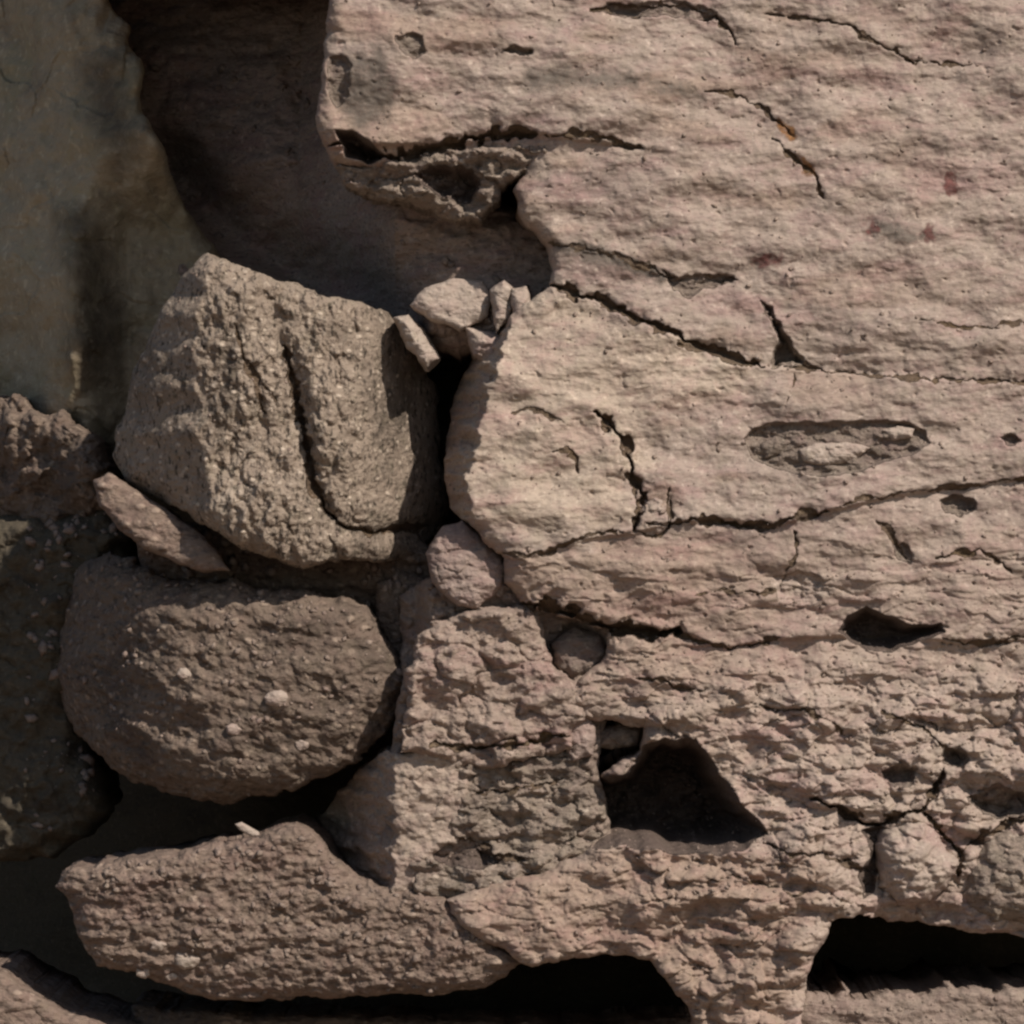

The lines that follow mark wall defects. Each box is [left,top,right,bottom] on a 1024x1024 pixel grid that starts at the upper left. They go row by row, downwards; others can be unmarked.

crack [589,0,735,41]
crack [766,13,972,68]
crack [328,125,643,162]
crack [550,282,1024,402]
crack [511,406,561,421]
crack [503,410,1024,596]